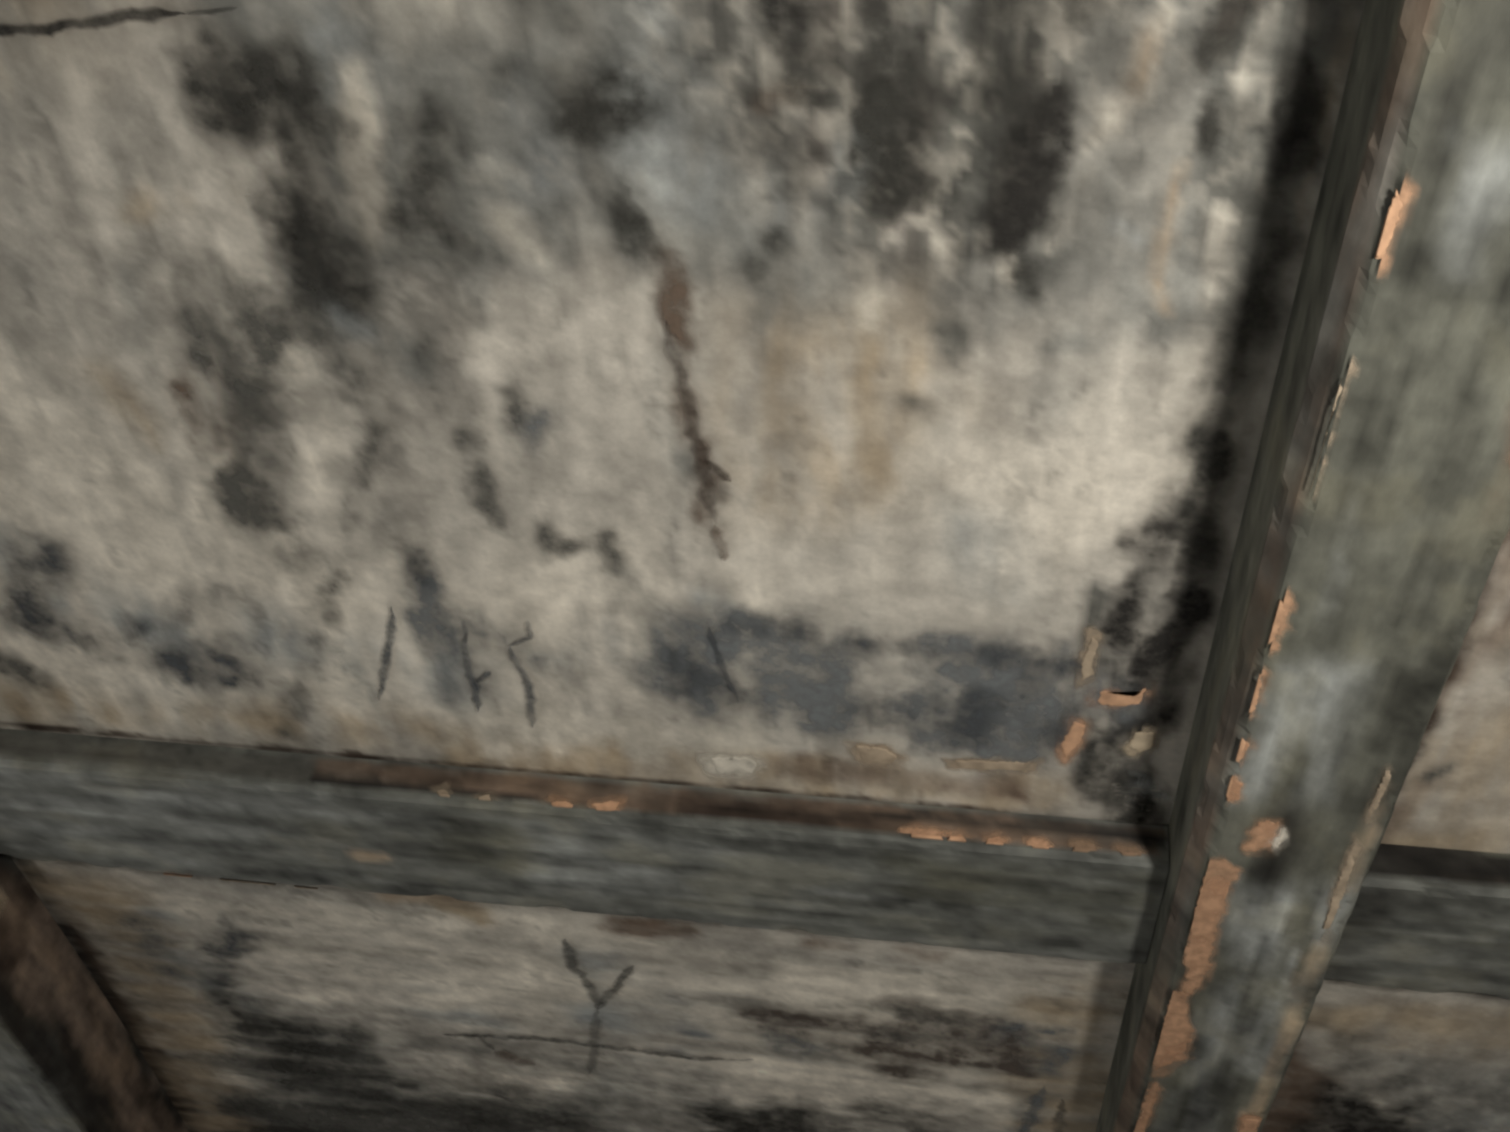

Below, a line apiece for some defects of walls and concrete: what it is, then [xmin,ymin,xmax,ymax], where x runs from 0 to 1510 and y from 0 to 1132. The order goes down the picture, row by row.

crack [0,9,222,36]
damp [183,32,320,162]
damp [989,86,1073,296]
peeling [1375,183,1412,271]
damp [185,182,373,413]
damp [639,611,874,733]
peeling [943,627,1148,773]
damp [884,424,1231,824]
peeling [1123,728,1156,757]
peeling [1267,590,1293,651]
damp [740,1009,1076,1079]
peeling [1134,859,1240,1132]